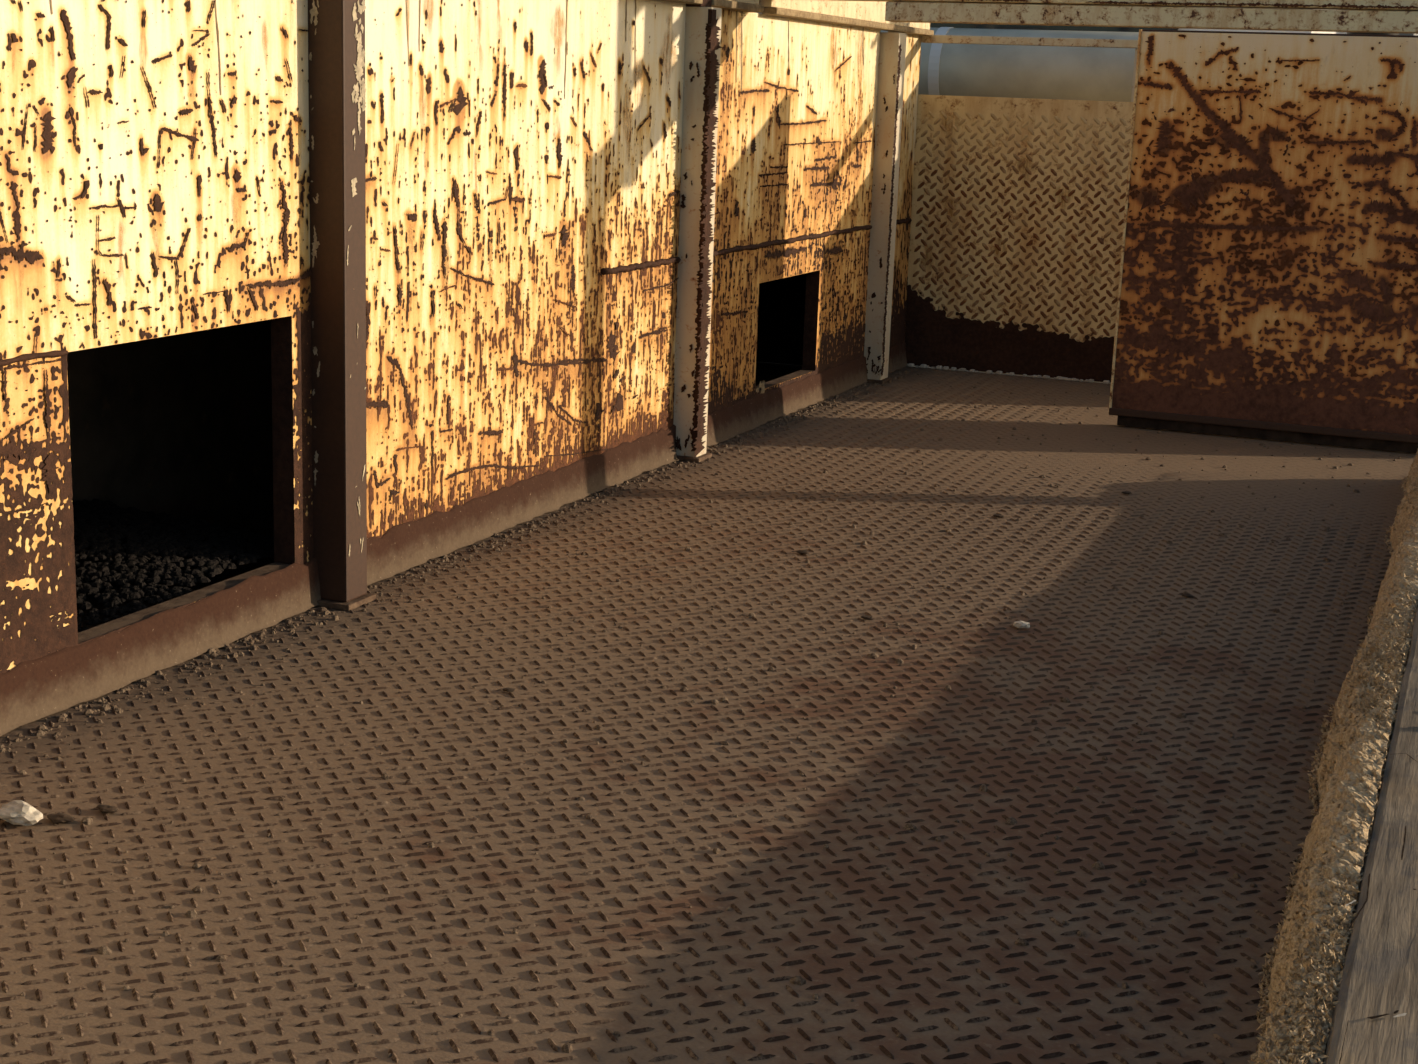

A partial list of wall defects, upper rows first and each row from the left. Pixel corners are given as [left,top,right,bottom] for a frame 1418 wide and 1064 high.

corrosion [450,86,468,115]
corrosion [539,10,563,94]
corrosion [741,82,826,126]
corrosion [1140,62,1418,234]
corrosion [0,243,44,265]
corrosion [247,181,312,289]
peeling [365,0,921,538]
corrosion [686,0,748,457]
peeling [0,0,314,674]
corrosion [387,356,419,429]
corrosion [517,319,638,430]
corrosion [904,285,1114,383]